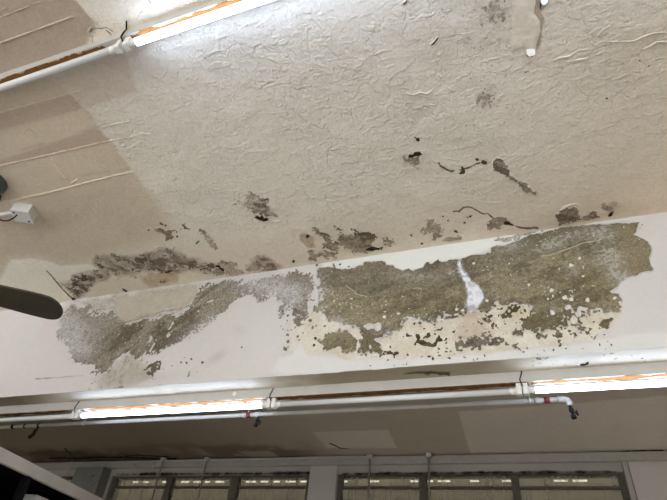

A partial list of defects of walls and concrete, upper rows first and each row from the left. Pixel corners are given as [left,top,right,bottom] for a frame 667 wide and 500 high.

peeling [462,0,548,60]
peeling [457,87,501,118]
damp [62,246,219,297]
damp [245,256,278,273]
flaking render [55,199,654,390]